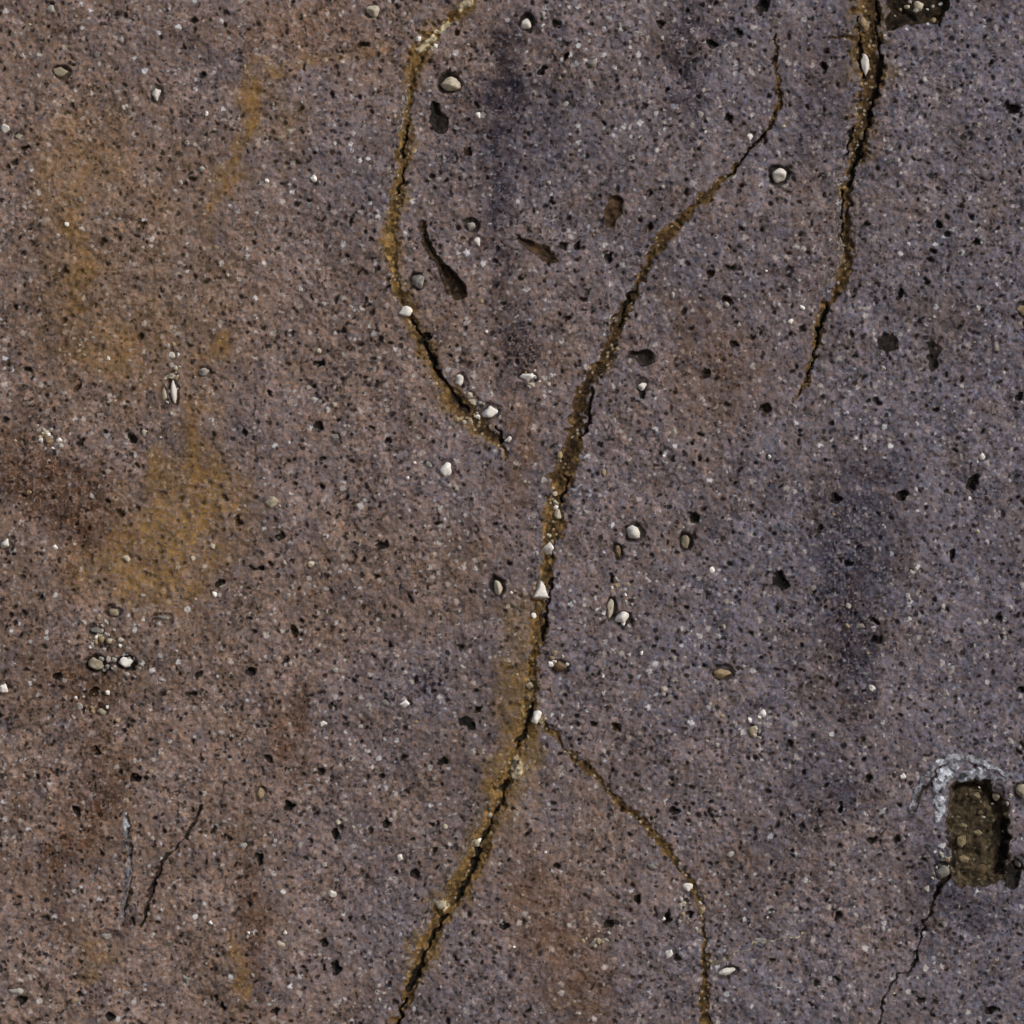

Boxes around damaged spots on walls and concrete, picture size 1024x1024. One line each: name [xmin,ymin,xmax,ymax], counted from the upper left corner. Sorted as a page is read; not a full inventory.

crack [793,0,888,400]
crack [381,0,784,1024]
crack [139,804,203,928]
spalling [909,753,1024,891]
crack [877,872,952,1024]